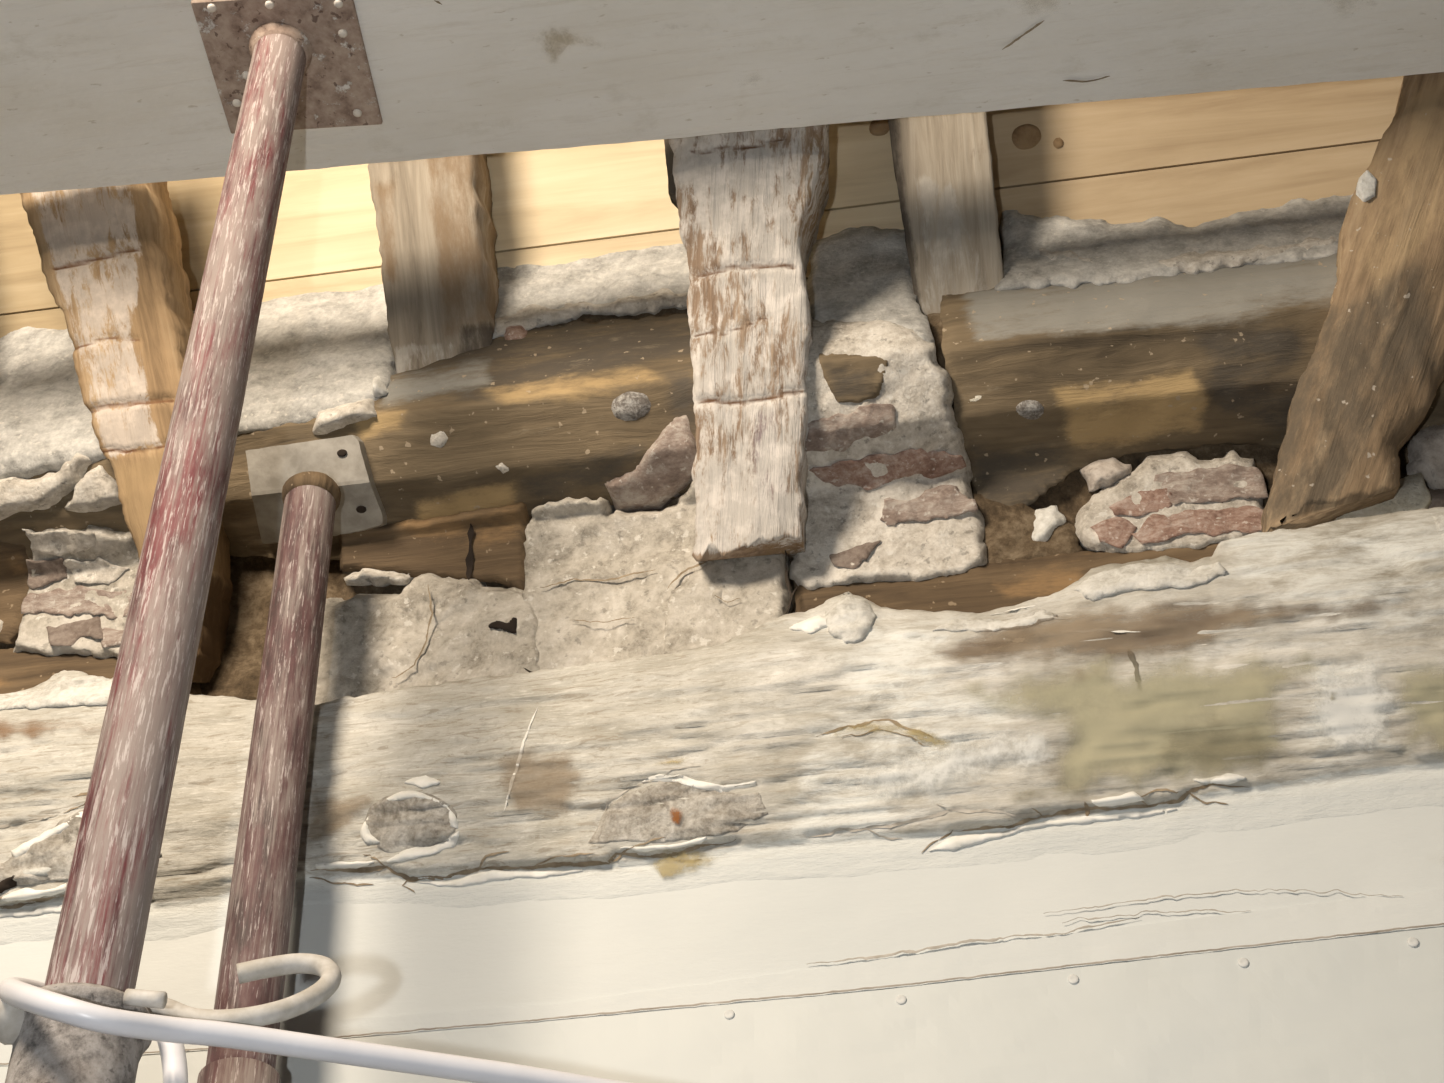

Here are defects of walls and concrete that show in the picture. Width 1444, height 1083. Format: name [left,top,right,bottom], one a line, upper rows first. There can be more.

water stain [942,603,1376,789]
water stain [1313,666,1444,747]
water stain [868,729,1048,792]
spalling [0,810,83,893]
spalling [360,775,459,863]
spalling [588,781,768,843]
crack [808,773,1246,853]
crack [0,883,66,918]